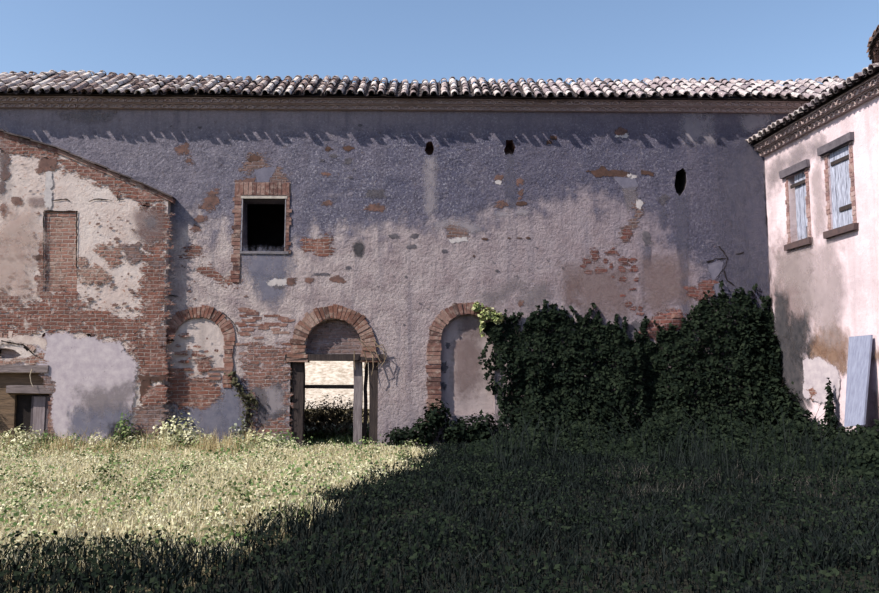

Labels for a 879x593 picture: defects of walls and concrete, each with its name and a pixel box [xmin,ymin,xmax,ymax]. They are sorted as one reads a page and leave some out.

damp [425,158,435,213]
flaking render [0,136,295,446]
damp [242,249,289,302]
damp [353,242,364,257]
flaking render [579,166,654,339]
flaking render [683,261,732,301]
crack [707,246,744,286]
damp [721,142,841,412]